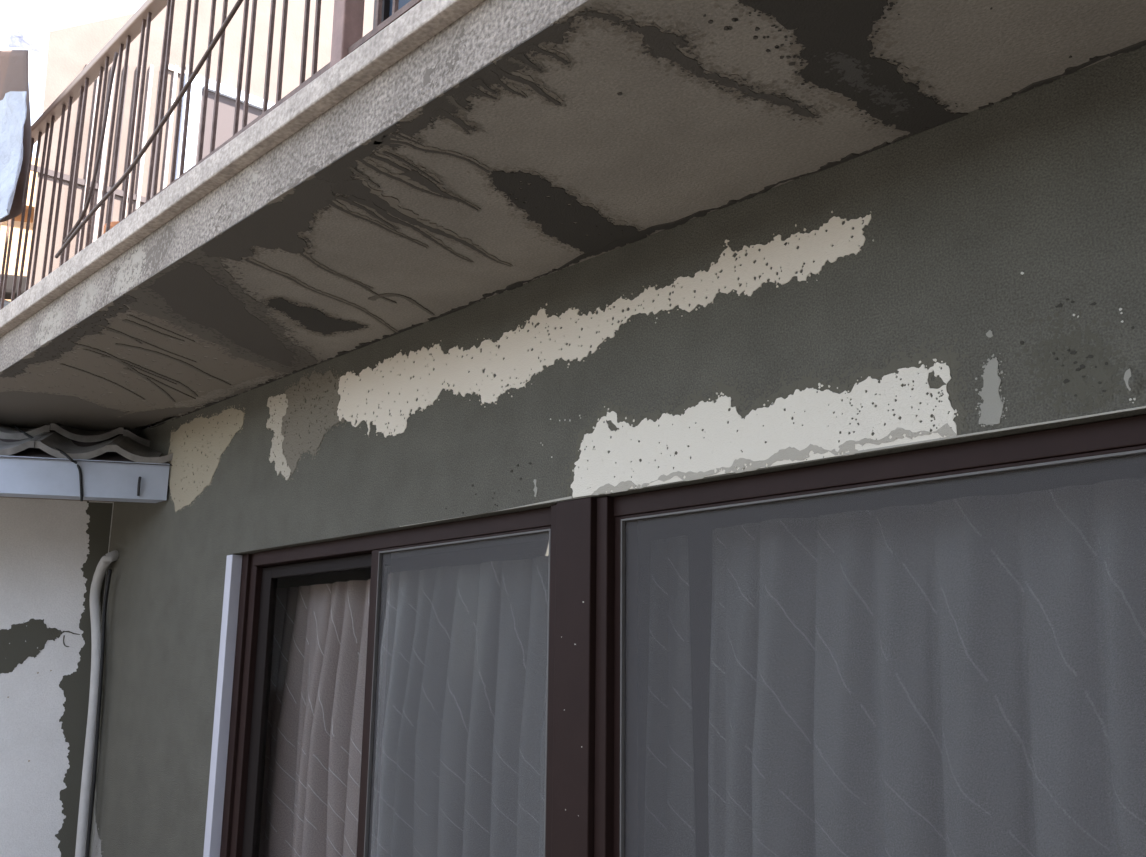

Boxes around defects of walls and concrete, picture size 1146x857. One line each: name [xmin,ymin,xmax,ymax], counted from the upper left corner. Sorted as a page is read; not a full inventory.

leakage [0,0,910,481]
peeling [337,211,872,438]
flaking render [168,404,245,512]
peeling [266,393,291,480]
peeling [92,820,102,857]